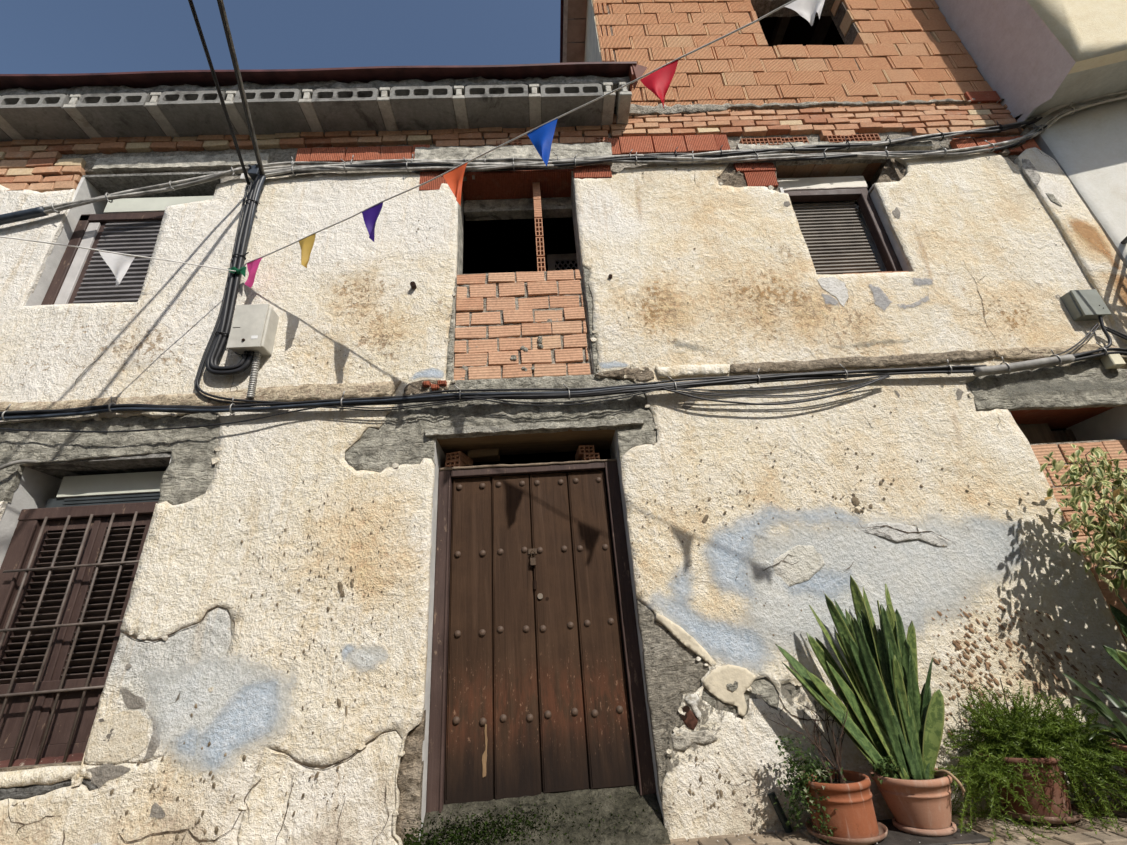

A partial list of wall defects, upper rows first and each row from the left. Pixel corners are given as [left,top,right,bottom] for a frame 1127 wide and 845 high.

peeling [817,277,867,324]
peeling [869,278,933,310]
crack [858,522,969,545]
peeling [636,508,1019,802]
peeling [0,607,426,845]
crack [96,730,395,844]
crack [8,799,65,845]